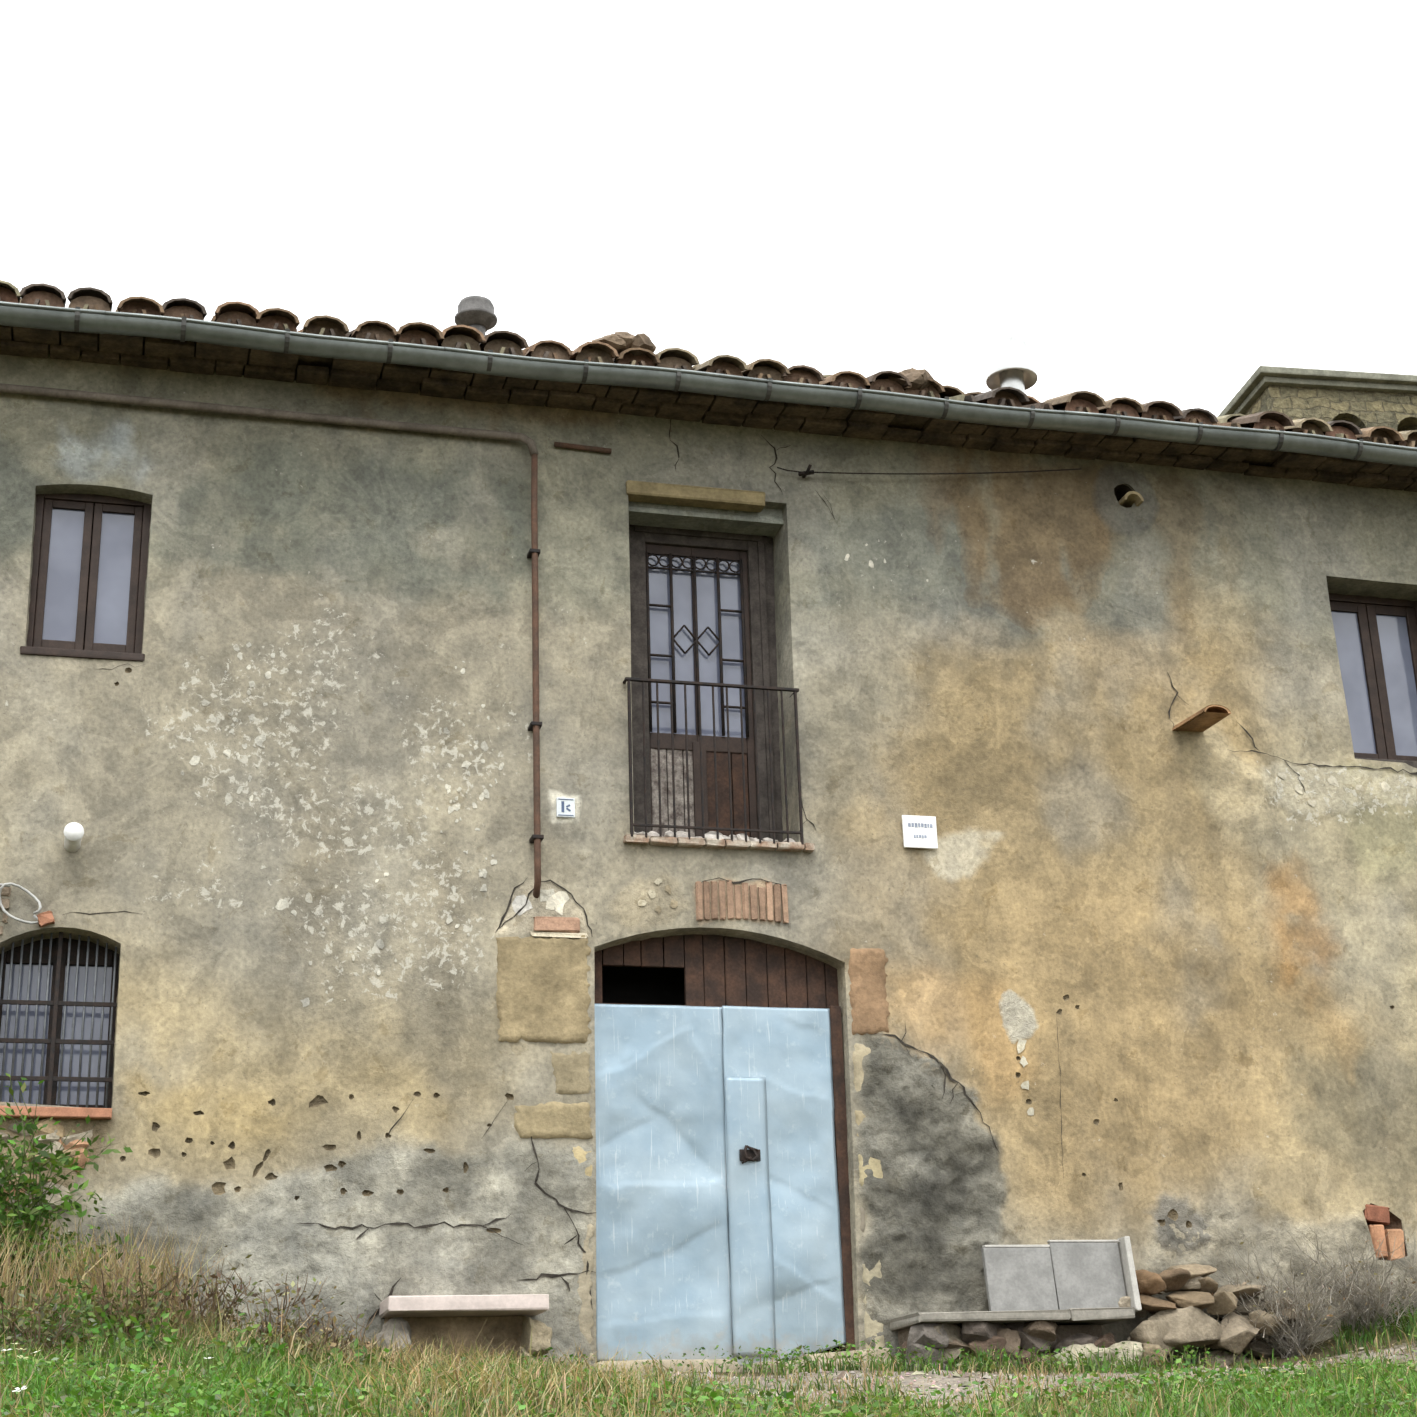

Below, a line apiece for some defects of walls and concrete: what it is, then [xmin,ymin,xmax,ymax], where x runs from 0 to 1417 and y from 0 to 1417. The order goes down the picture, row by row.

crack [1167,672,1189,725]
peeling [424,704,504,833]
peeling [1256,757,1417,824]
peeling [463,850,497,891]
spalling [0,886,11,942]
peeling [275,892,325,931]
peeling [998,989,1040,1116]
spalling [309,1095,328,1108]
spalling [0,1102,597,1372]
crack [296,1214,522,1245]
crack [521,1136,596,1309]
spalling [848,1026,1014,1357]